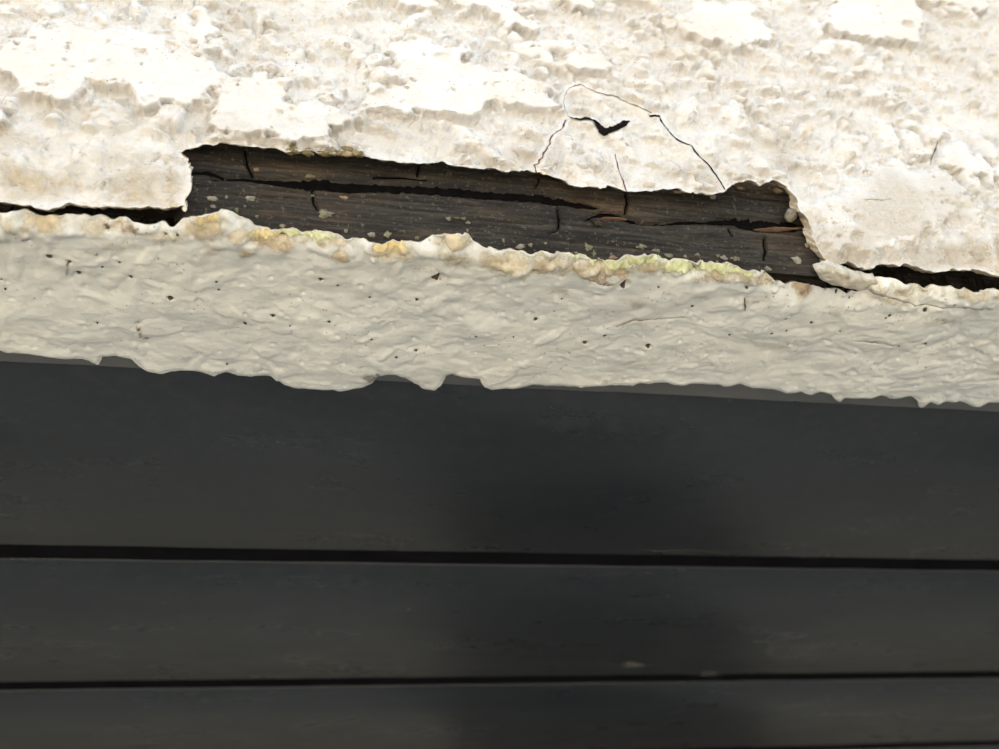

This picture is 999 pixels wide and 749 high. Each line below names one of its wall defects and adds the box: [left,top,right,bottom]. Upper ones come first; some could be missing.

crack [533,84,726,215]
spalling [174,142,723,212]
water stain [162,213,350,263]
water stain [373,240,412,260]
water stain [442,233,471,264]
water stain [481,251,667,285]
water stain [693,262,772,285]
peeling [733,180,878,298]
crack [811,270,999,310]